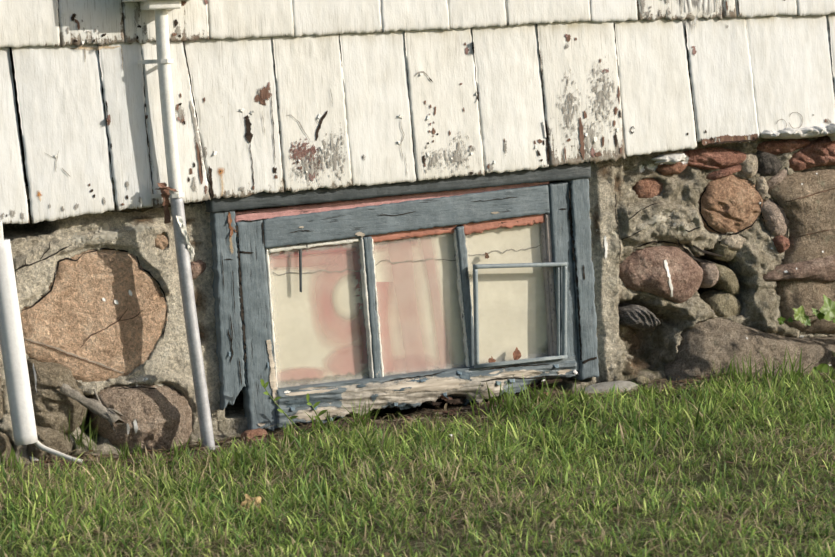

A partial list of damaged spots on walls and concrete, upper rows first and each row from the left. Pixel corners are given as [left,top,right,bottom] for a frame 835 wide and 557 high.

peeling [254,82,278,179]
peeling [289,122,347,191]
peeling [422,100,475,175]
peeling [556,56,622,162]
peeling [371,364,578,409]